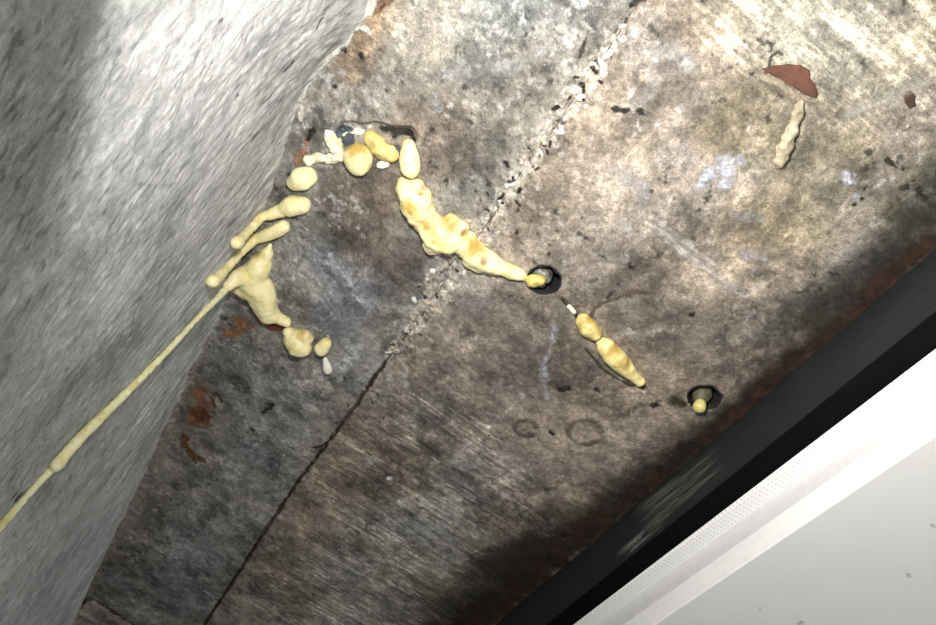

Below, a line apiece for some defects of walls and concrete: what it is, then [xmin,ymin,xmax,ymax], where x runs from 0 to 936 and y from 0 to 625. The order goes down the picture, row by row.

crack [605,0,640,54]
leakage [651,51,694,70]
crack [549,92,579,134]
leakage [696,156,740,190]
leakage [842,170,859,198]
crack [561,290,650,318]
crack [585,348,647,390]
leakage [427,179,936,625]
rust [180,387,223,463]
crack [203,257,460,625]
crack [82,598,134,625]